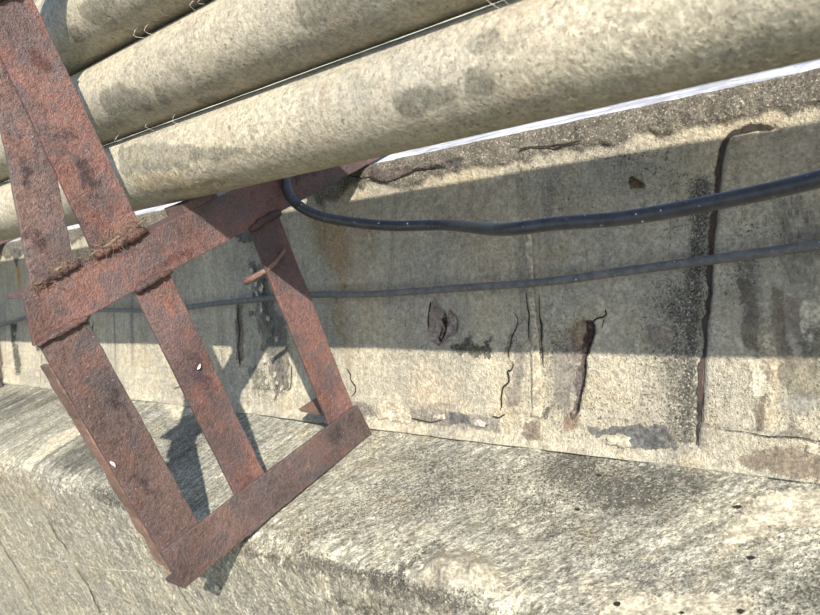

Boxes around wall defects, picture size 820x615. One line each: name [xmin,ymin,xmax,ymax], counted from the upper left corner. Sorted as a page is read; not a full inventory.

spalling [427,299,458,346]
crack [500,294,543,411]
spalling [551,309,607,431]
crack [696,124,774,445]
peeling [588,423,677,451]